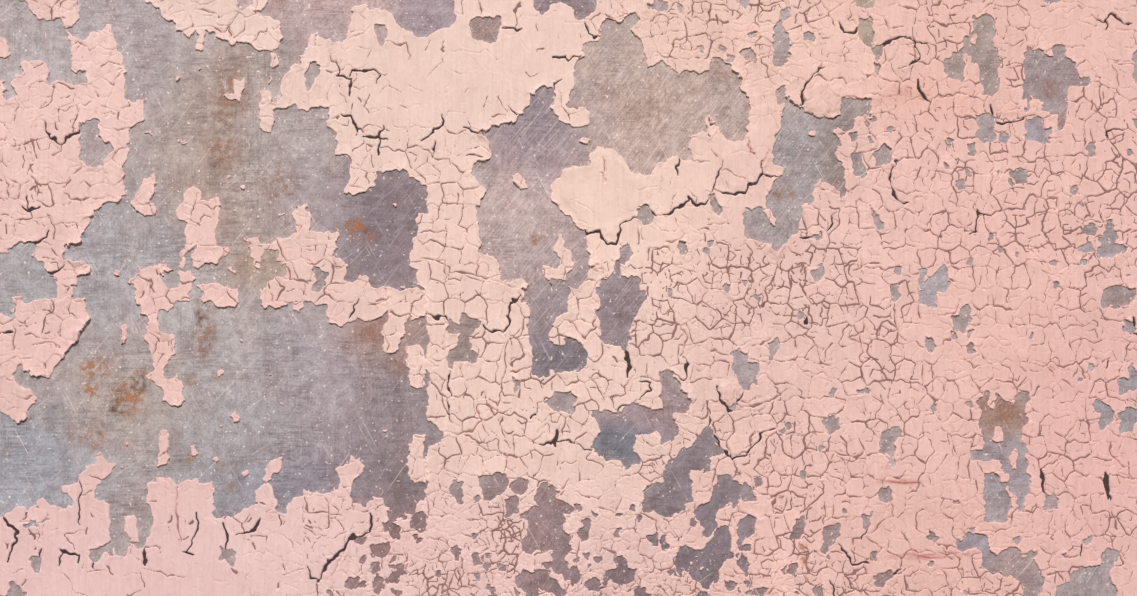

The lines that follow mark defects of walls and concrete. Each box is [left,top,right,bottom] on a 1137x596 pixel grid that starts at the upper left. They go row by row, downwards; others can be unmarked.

crack [0,0,136,408]
crack [138,270,191,391]
peeling [0,0,502,596]
crack [248,233,424,352]
peeling [471,0,761,378]
crack [326,0,1137,596]
peeling [742,86,893,252]
crack [3,475,199,596]
crack [222,486,526,596]
peeling [449,472,652,596]
peeling [591,370,768,596]
peeling [956,391,1120,596]